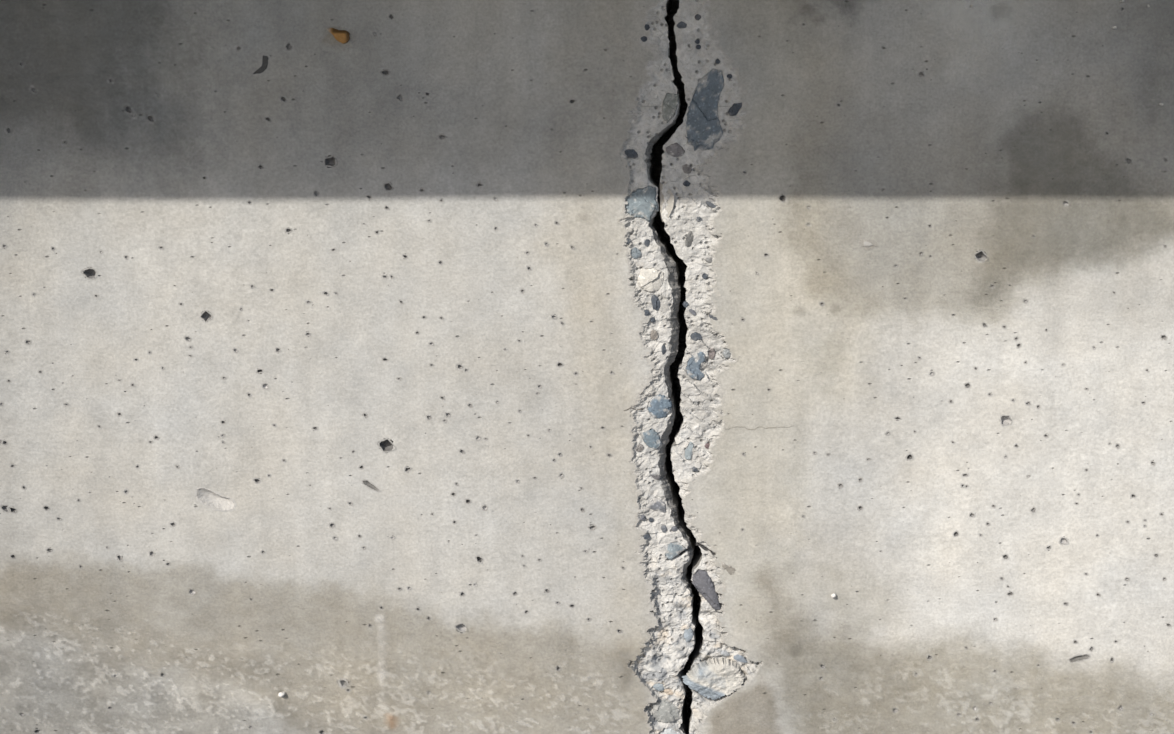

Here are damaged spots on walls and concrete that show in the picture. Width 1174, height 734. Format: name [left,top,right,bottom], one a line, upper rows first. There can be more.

crack [624,0,717,734]
spalling [616,0,765,734]